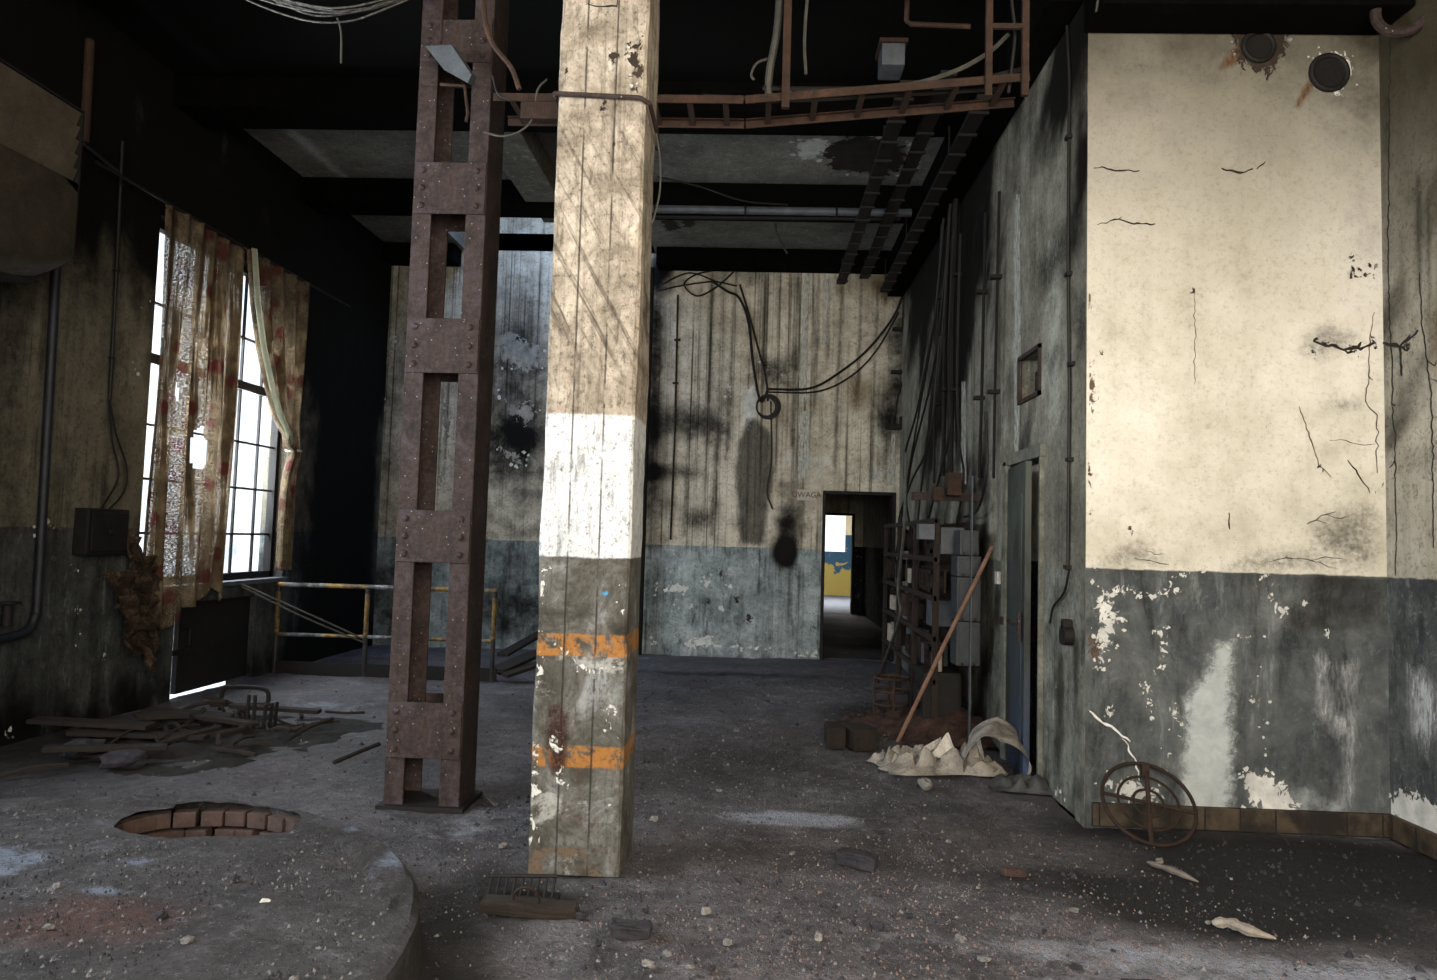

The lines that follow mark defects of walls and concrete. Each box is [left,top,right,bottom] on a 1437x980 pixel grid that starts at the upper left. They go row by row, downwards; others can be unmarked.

crack [1098,165,1140,173]
crack [1221,161,1266,174]
crack [1097,217,1155,226]
crack [1269,37,1437,575]
damp [737,421,772,544]
peeling [1088,555,1222,671]
rust [548,705,567,769]
flaking render [1094,634,1302,810]
damp [1412,677,1435,739]
peeling [529,732,569,843]
peeling [1389,786,1437,833]